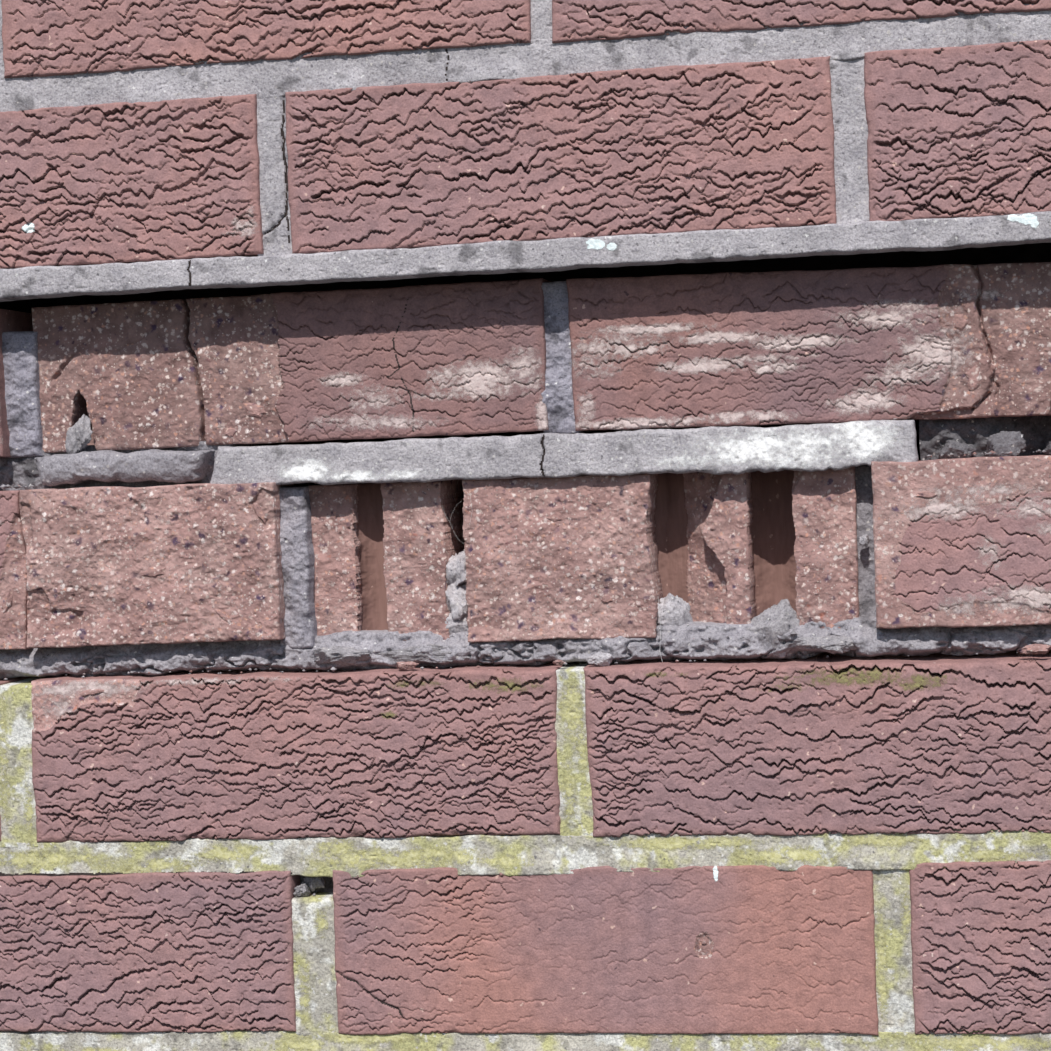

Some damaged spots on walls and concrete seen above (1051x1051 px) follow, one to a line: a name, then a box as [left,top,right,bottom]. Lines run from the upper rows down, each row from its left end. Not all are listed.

spalling [32,293,289,453]
damp [311,372,434,430]
damp [420,348,548,431]
damp [572,299,973,468]
spalling [308,484,363,636]
spalling [380,474,663,643]
spalling [683,472,757,624]
spalling [792,466,859,629]
damp [40,680,152,716]